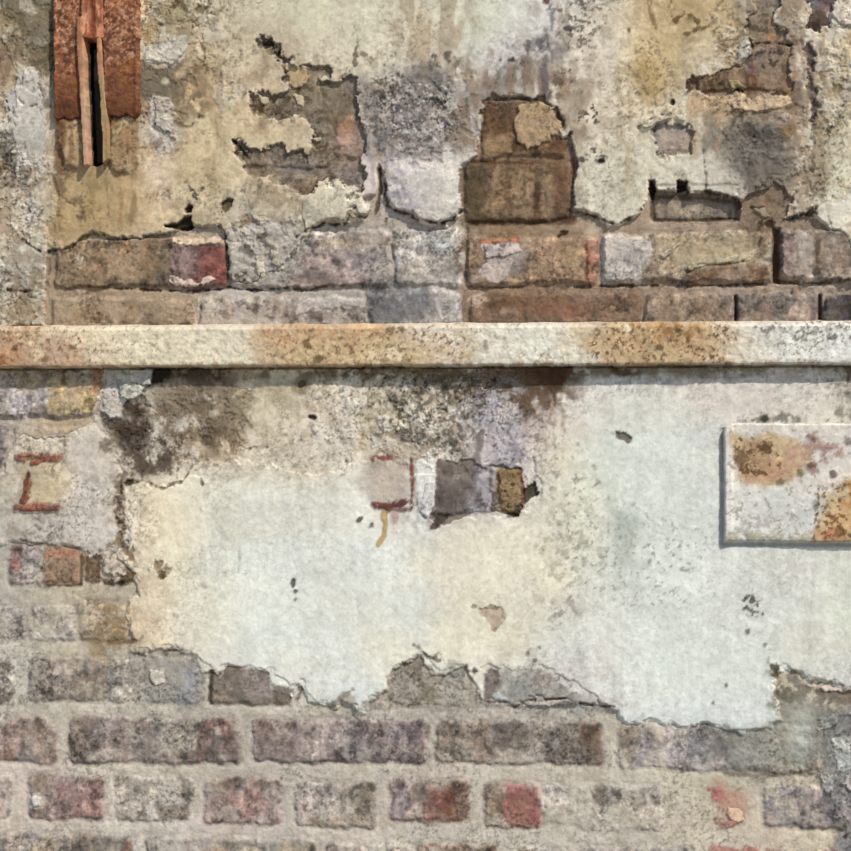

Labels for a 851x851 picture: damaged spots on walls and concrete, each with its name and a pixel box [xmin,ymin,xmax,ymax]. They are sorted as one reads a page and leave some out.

spalling [637,0,795,157]
spalling [46,34,370,325]
spalling [458,93,595,228]
spalling [428,180,794,322]
peeling [100,369,153,418]
water stain [100,368,253,528]
spalling [415,458,539,529]
water stain [300,366,774,472]
spalling [43,546,136,587]
peeling [91,604,304,709]
peeling [306,644,615,718]
peeling [770,663,851,851]